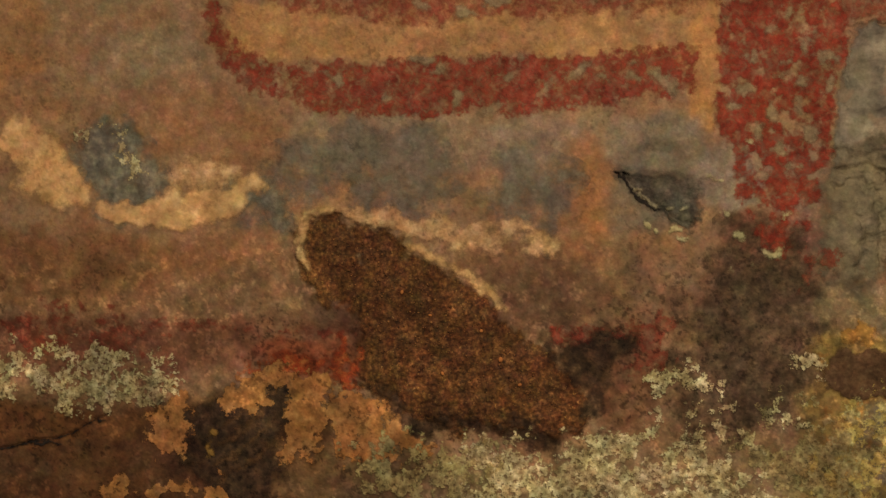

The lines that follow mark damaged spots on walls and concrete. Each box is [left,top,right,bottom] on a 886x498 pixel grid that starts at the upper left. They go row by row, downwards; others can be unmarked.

flaking render [841,320,876,347]